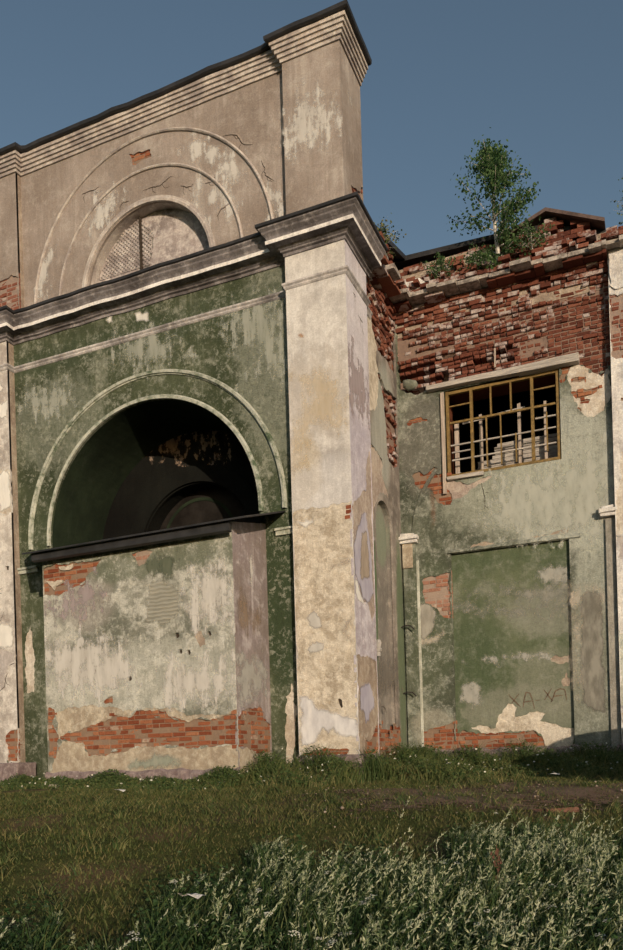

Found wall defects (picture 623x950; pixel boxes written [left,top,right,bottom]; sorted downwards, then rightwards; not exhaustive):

flaking render [130,150,152,165]
crack [223,133,275,182]
crack [118,175,219,208]
spalling [0,272,21,310]
spalling [285,264,623,763]
spalling [42,557,102,596]
spalling [132,549,153,566]
spalling [0,627,35,693]
spalling [6,728,22,763]
spalling [48,696,272,775]